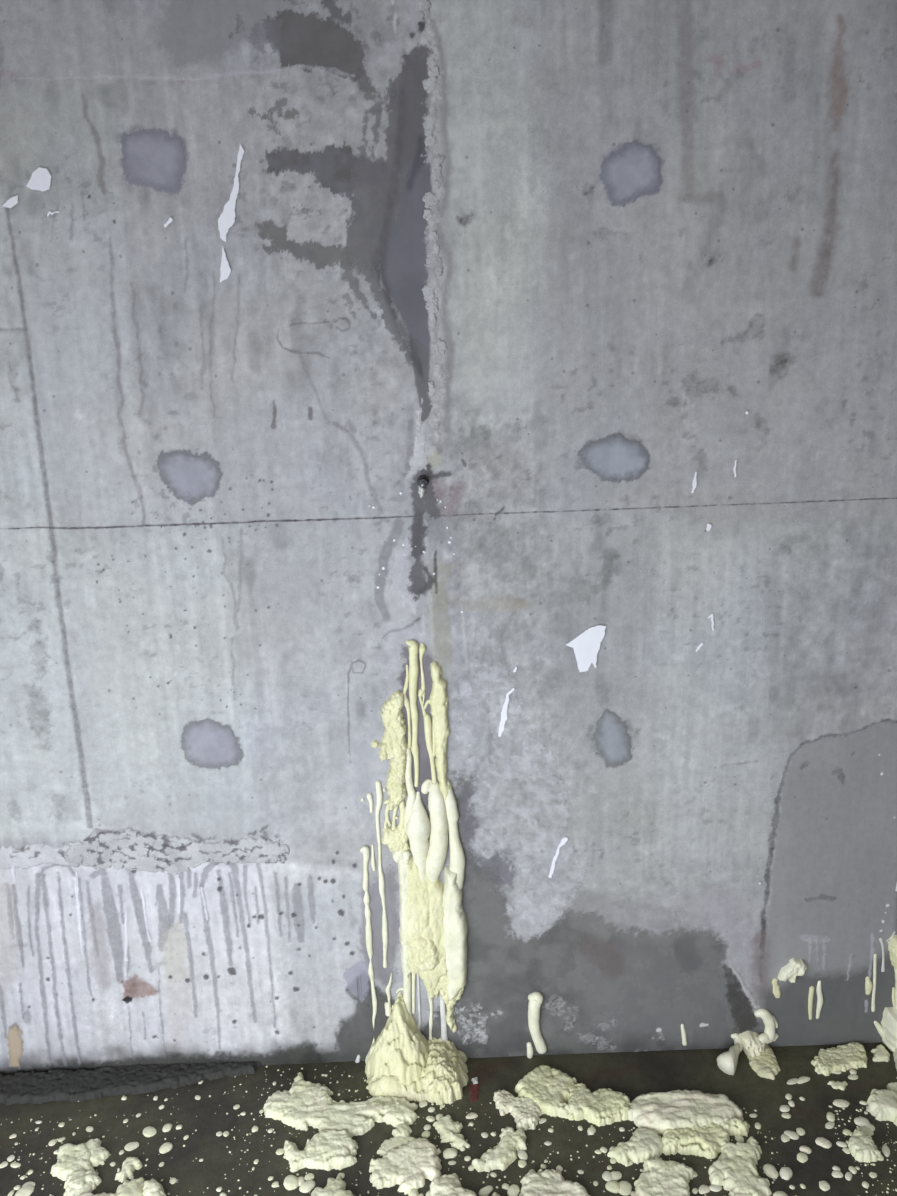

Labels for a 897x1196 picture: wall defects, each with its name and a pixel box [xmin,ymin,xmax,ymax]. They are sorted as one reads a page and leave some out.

leakage [158,0,433,367]
leakage [0,988,24,1037]
leakage [8,862,314,1062]
leakage [320,974,395,1063]
leakage [421,676,897,1058]